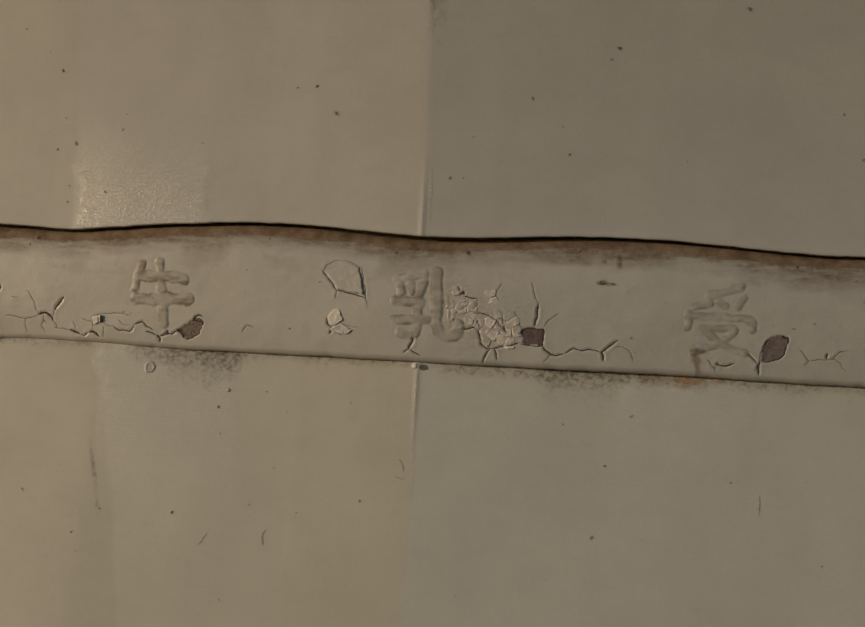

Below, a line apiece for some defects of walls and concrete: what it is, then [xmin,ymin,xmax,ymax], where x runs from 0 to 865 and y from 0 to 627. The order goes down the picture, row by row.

crack [0,285,176,342]
peeling [176,314,203,340]
peeling [322,260,367,335]
peeling [444,285,544,364]
crack [513,281,633,363]
peeling [760,335,789,363]
crack [799,349,846,372]